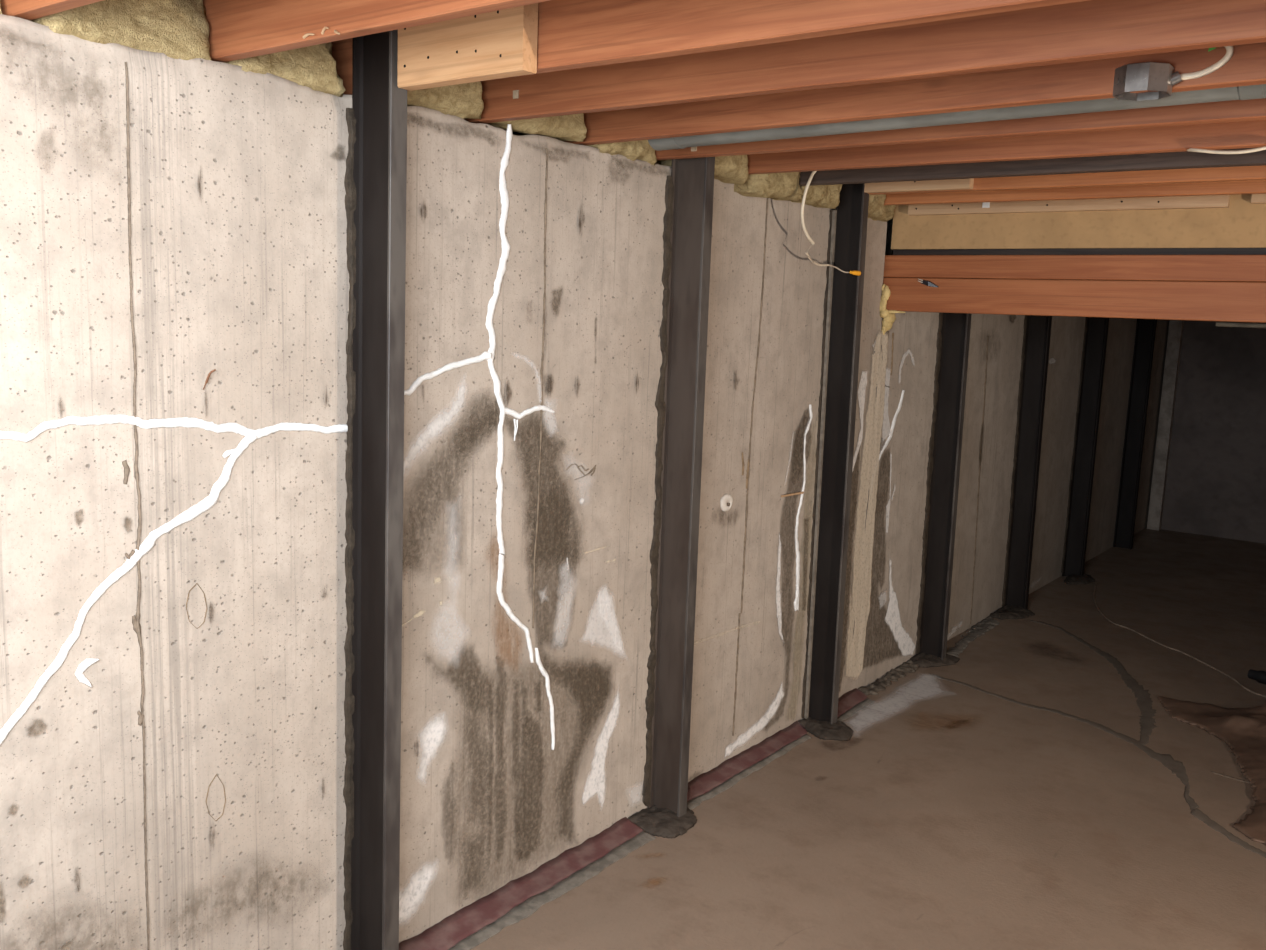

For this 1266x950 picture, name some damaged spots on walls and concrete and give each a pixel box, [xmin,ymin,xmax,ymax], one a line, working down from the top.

crack [0,414,348,745]
damp [404,387,464,467]
crack [404,124,555,750]
damp [511,419,584,645]
efflorescence [584,589,622,652]
damp [725,411,811,756]
crack [794,404,813,611]
efflorescence [420,719,445,778]
damp [449,651,619,888]
crack [929,620,1266,858]
efflorescence [399,866,434,922]